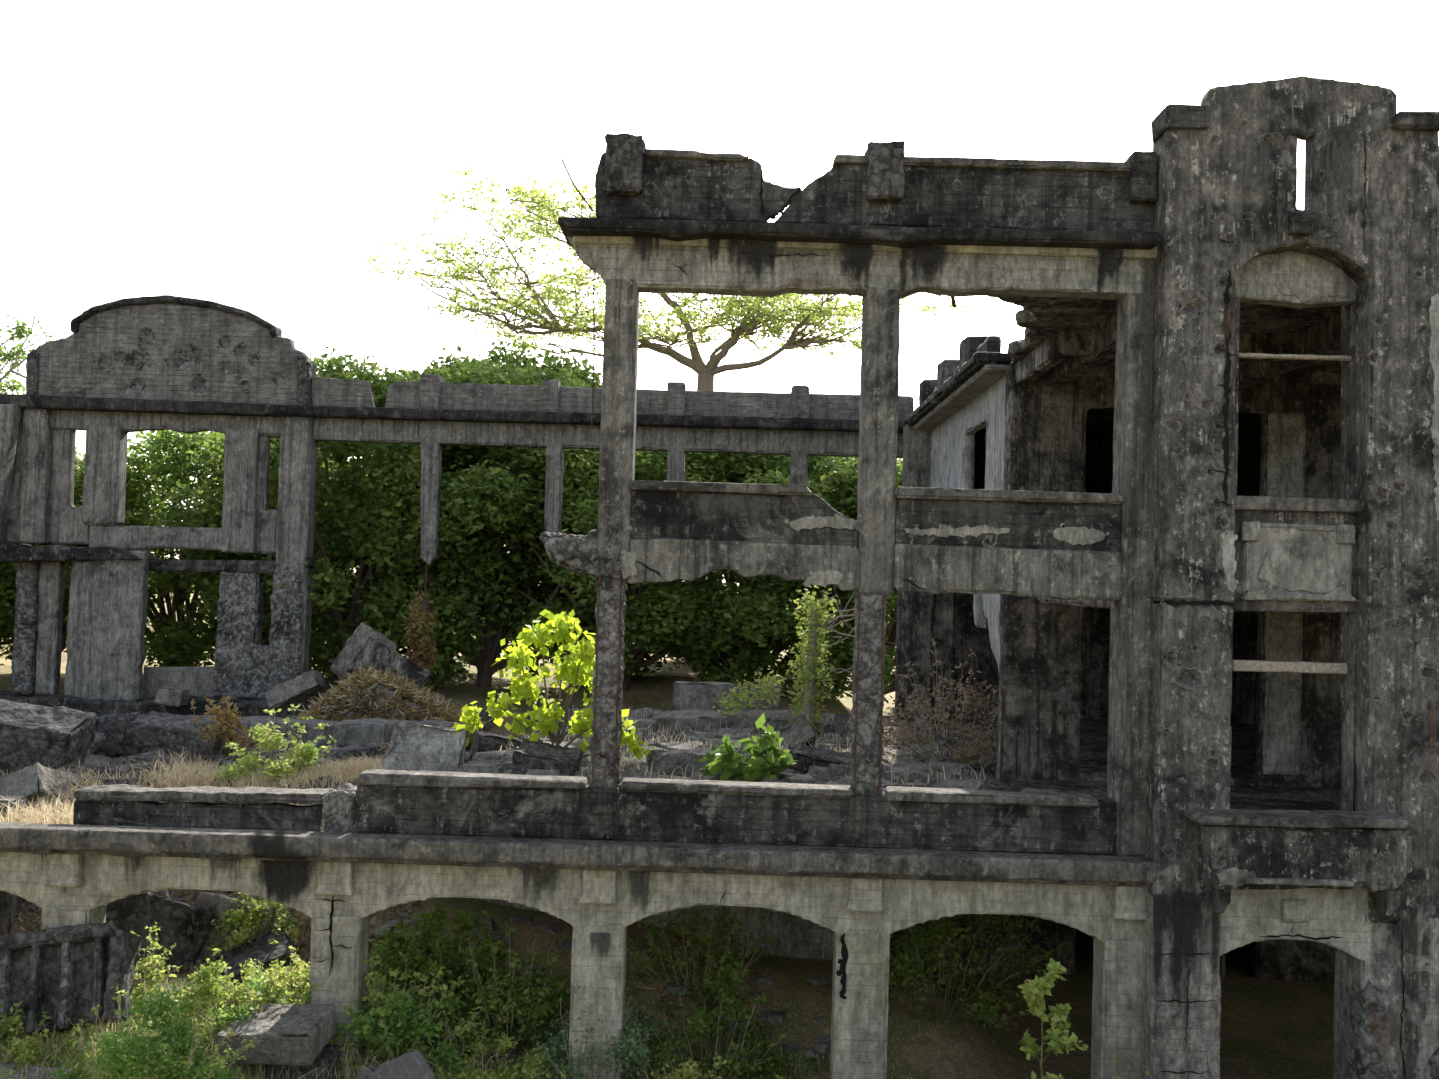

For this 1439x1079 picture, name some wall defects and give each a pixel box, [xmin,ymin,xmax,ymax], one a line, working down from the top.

crack [759,167,806,220]
crack [756,253,826,269]
peeling [759,513,882,542]
peeling [899,520,1010,547]
peeling [1053,523,1109,545]
spalling [1220,531,1239,593]
peeling [1257,546,1345,594]
peeling [1159,600,1227,626]
damp [1153,890,1220,1018]
peeling [1382,904,1436,1079]